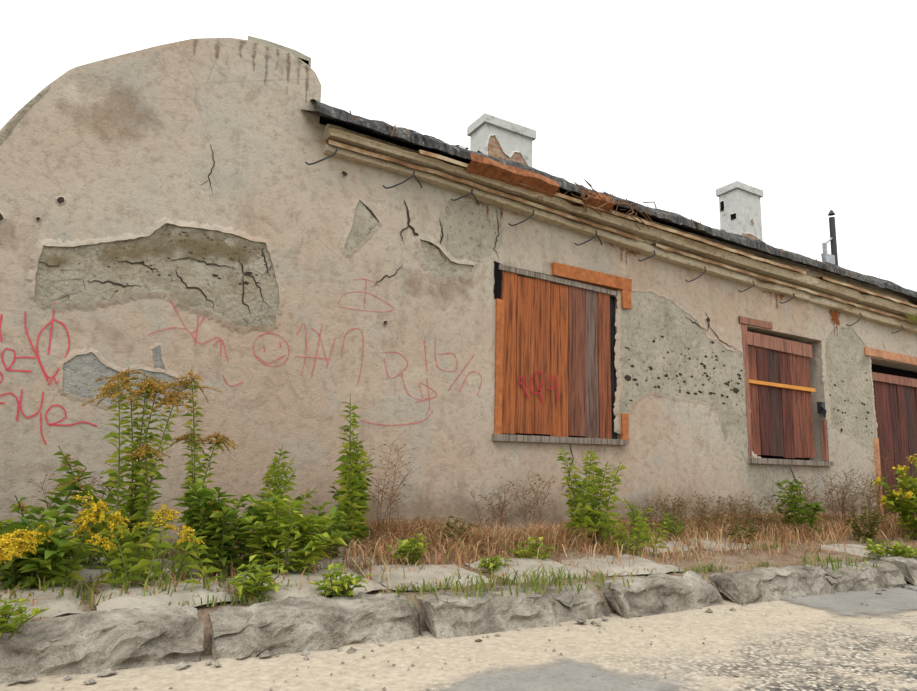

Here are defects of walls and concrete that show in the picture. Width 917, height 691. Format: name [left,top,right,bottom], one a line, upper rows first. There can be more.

crack [200,145,215,193]
flaking render [24,217,286,335]
flaking render [338,196,383,258]
crack [373,200,445,287]
peeling [413,195,506,299]
flaking render [56,343,195,410]
flaking render [613,287,801,517]
flaking render [821,322,878,452]